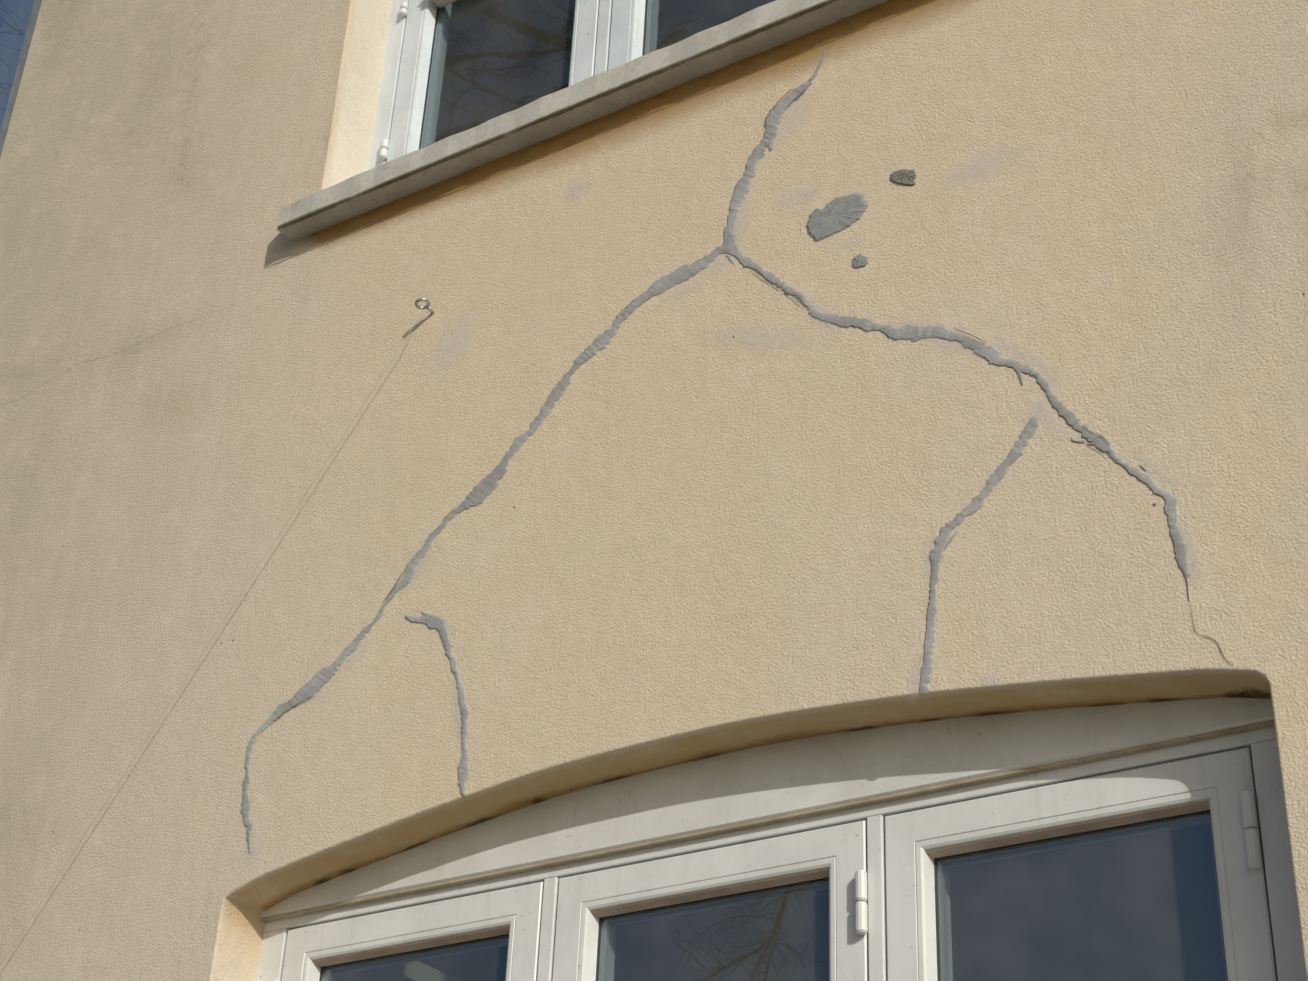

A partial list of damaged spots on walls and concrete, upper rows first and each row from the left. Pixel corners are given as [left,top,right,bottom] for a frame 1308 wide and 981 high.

spalling [890,169,917,186]
spalling [806,193,868,242]
spalling [852,253,869,268]
crack [241,50,1232,853]